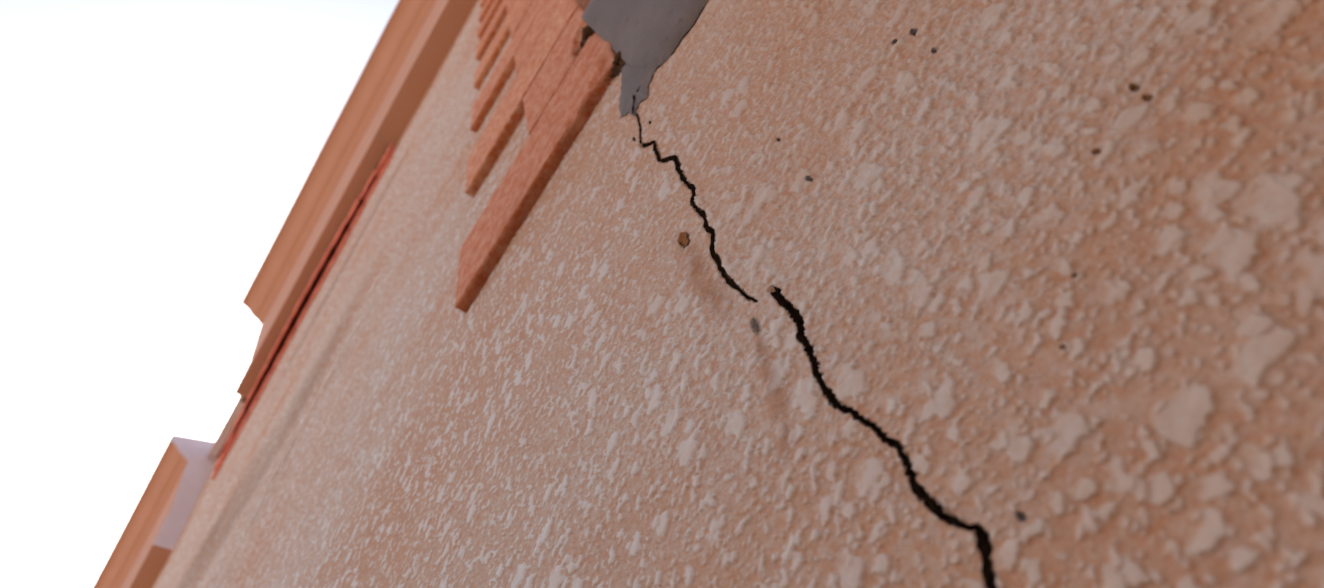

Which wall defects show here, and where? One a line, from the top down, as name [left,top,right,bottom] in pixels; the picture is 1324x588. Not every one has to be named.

crack [632,95,997,588]